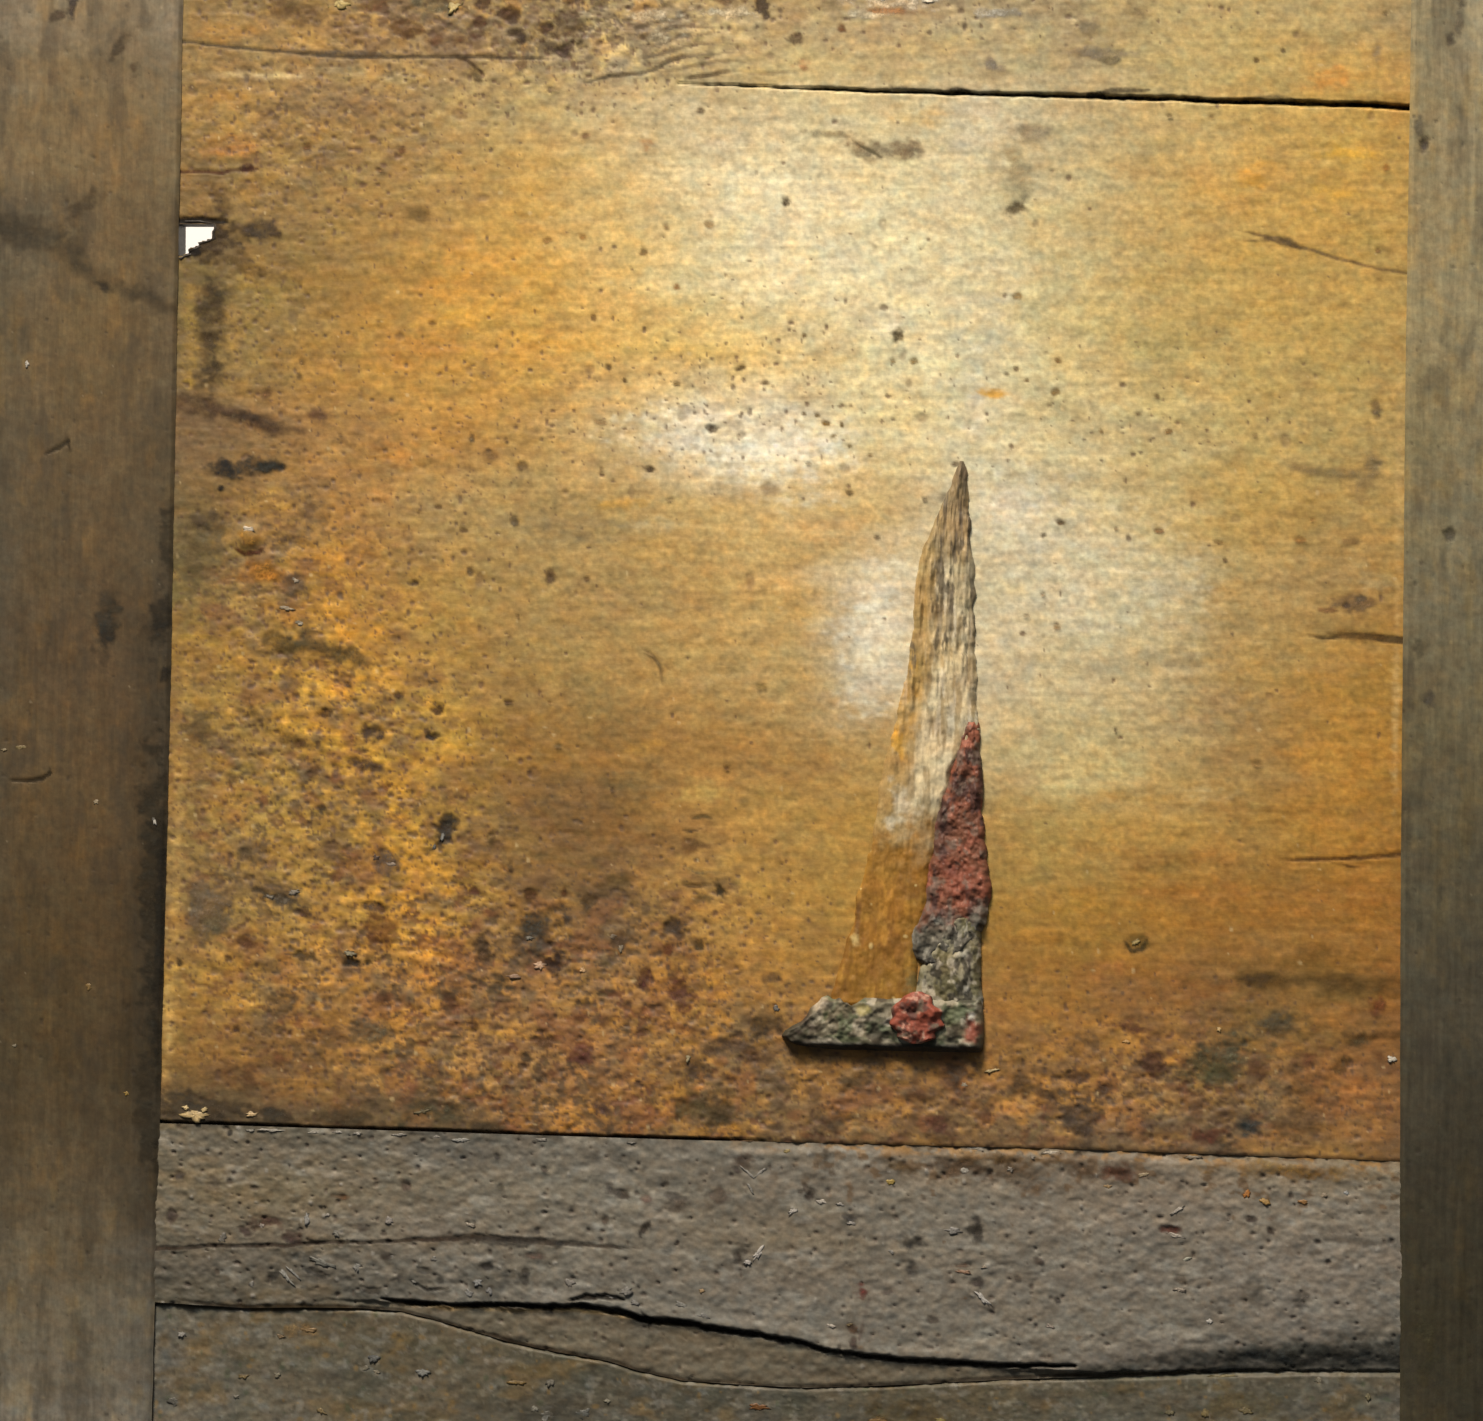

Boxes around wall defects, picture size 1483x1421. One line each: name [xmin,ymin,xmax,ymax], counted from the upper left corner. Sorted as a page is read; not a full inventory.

crack [591,17,1410,110]
water stain [179,200,281,264]
water stain [196,277,224,382]
water stain [178,399,280,433]
water stain [216,456,285,490]
corrosion [348,758,388,790]
corrosion [425,814,458,855]
corrosion [343,950,370,966]
corrosion [473,889,597,993]
corrosion [664,919,704,955]
crack [155,1234,626,1250]
crack [195,1286,1205,1388]